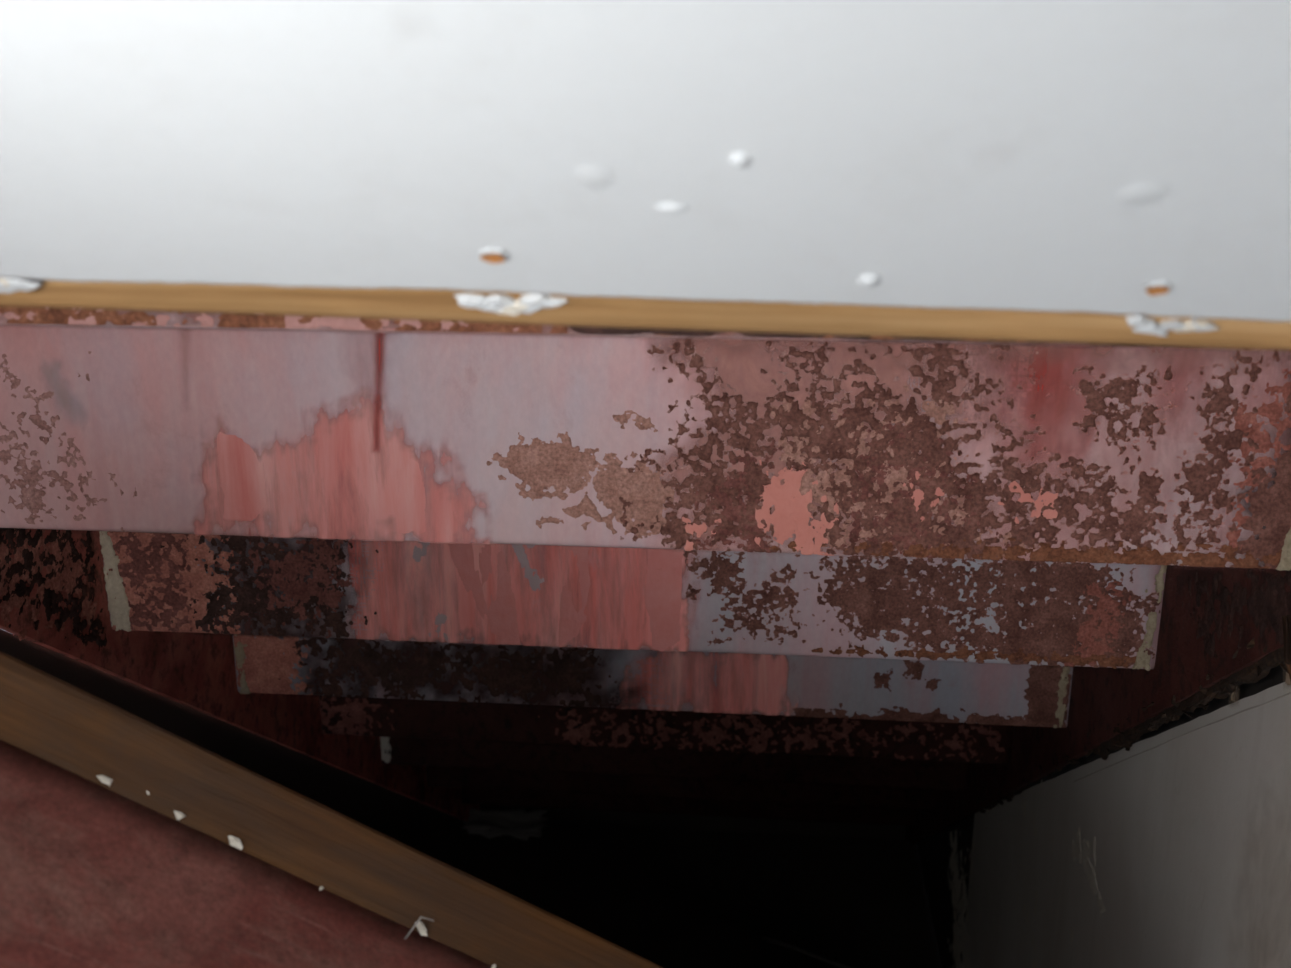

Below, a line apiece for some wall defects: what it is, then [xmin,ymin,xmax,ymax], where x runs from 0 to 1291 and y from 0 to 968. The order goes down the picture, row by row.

peeling [194,398,791,716]
rust [0,306,1291,762]
peeling [754,460,839,556]
peeling [903,471,945,522]
peeling [998,481,1058,524]